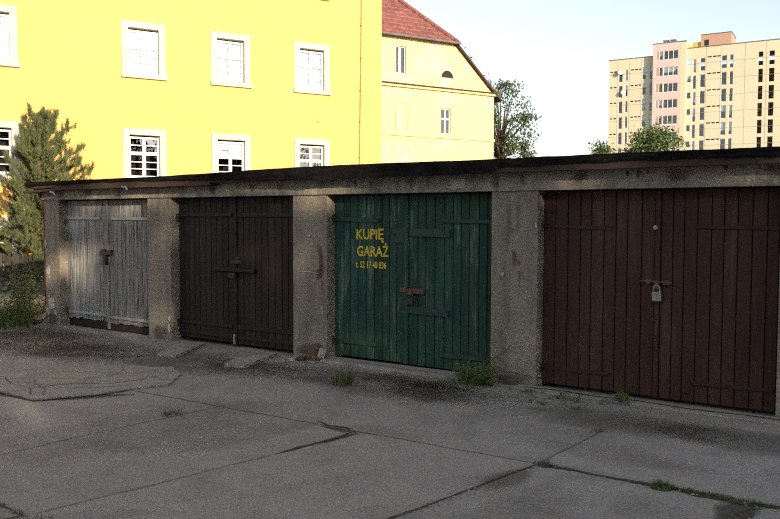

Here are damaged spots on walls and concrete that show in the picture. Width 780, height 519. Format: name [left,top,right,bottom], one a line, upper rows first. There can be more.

flaking render [381,43,474,132]
flaking render [381,144,413,163]
crack [1,366,134,395]